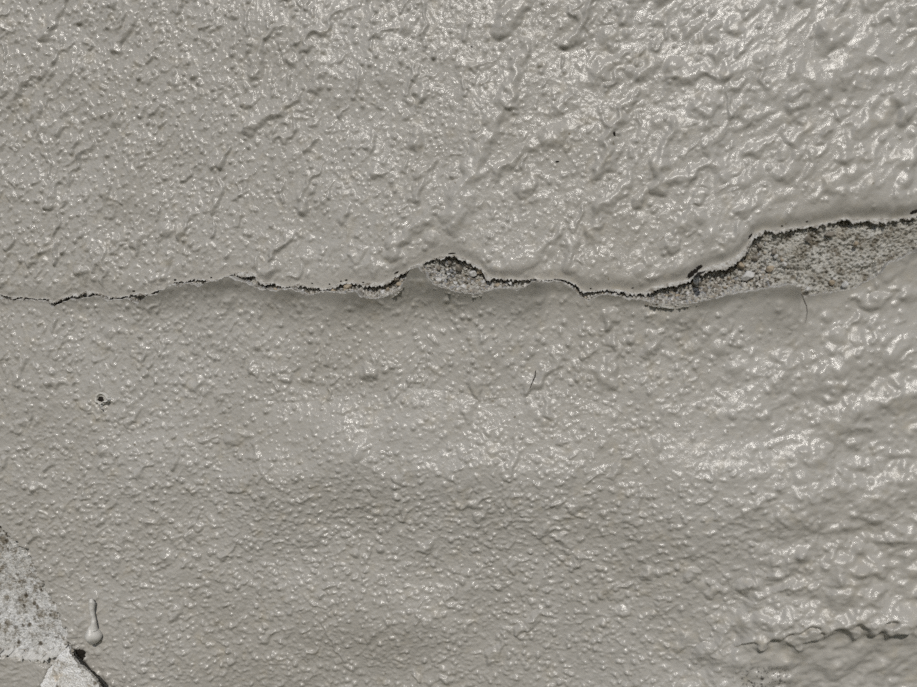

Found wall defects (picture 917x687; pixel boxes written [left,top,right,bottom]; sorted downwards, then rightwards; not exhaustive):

crack [0,194,917,388]
peeling [0,526,102,687]